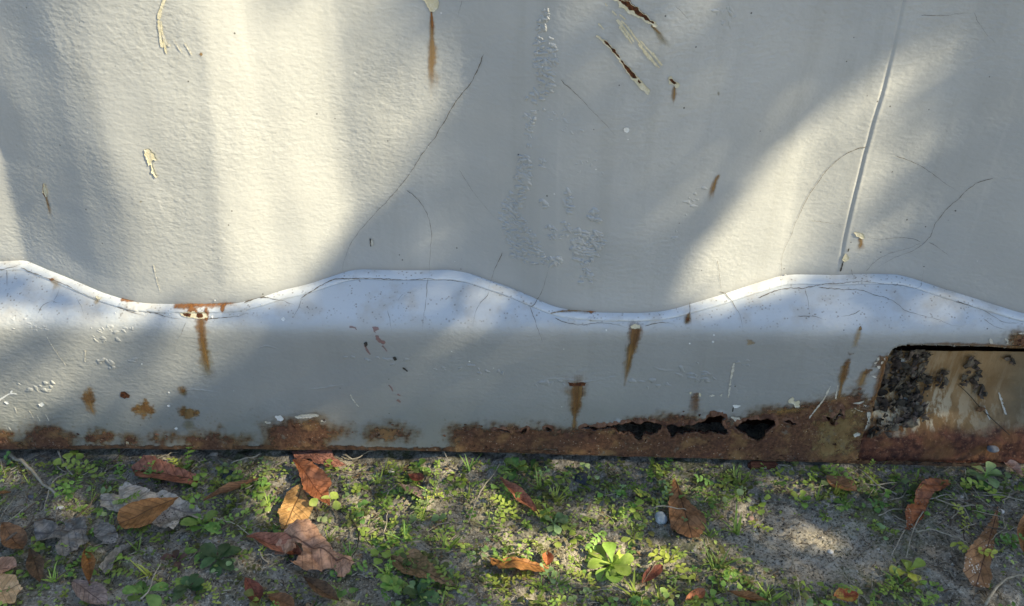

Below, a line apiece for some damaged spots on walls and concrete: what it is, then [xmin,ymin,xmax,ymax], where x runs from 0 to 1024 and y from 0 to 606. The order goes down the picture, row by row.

spalling [614,0,660,34]
spalling [596,35,650,95]
peeling [144,149,158,178]
crack [244,54,542,339]
rust [174,303,231,364]
rust [627,324,640,373]
rust [0,332,1024,467]
peeling [853,396,876,437]